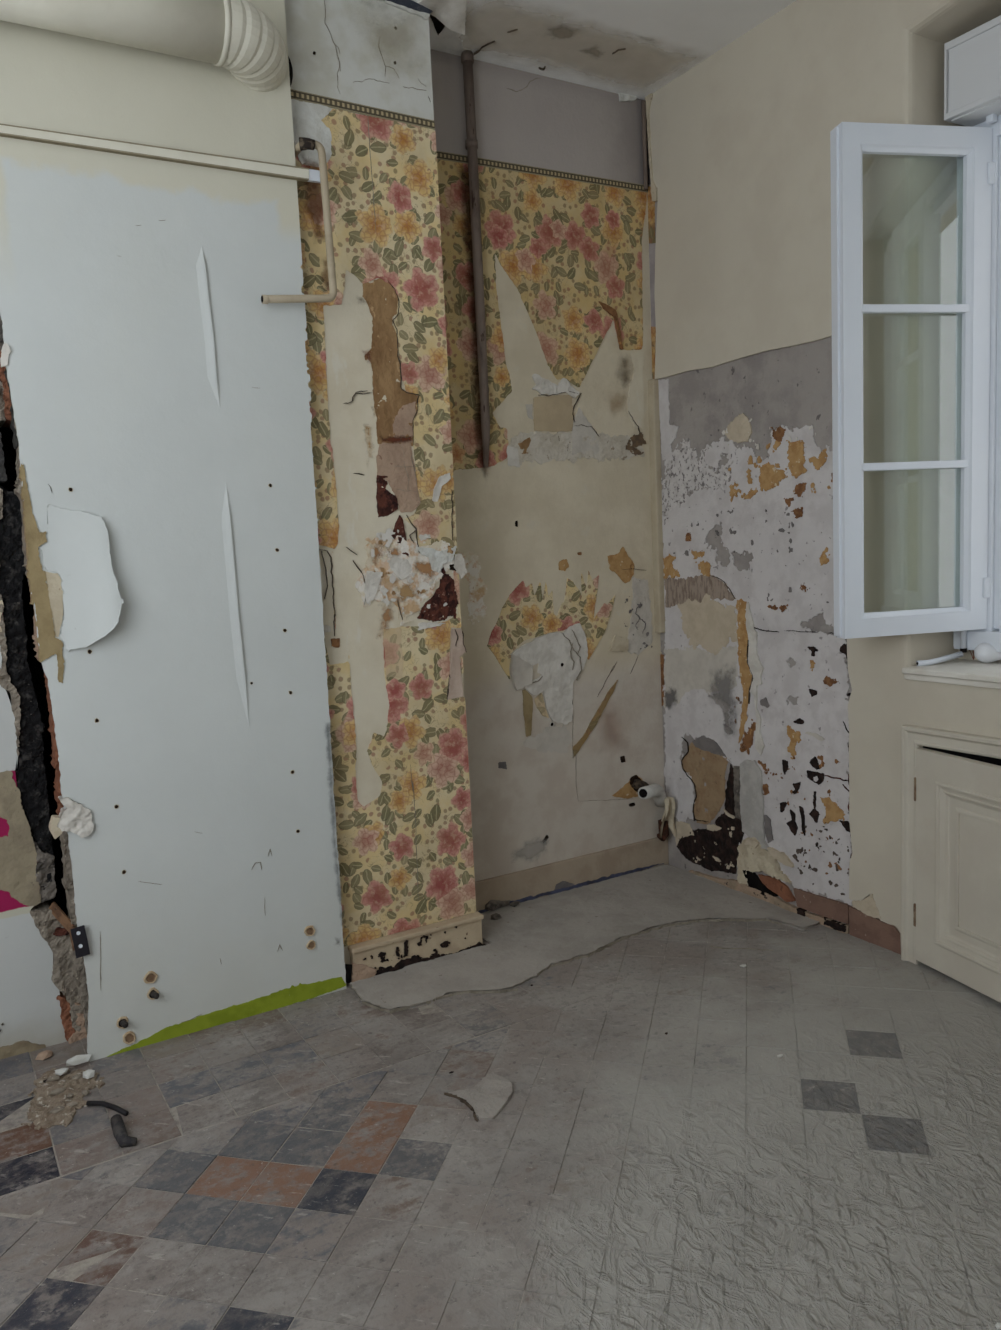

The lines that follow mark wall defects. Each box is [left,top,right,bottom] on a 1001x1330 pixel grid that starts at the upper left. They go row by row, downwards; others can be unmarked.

crack [324,0,431,102]
flaking render [291,99,332,167]
flaking render [362,278,467,630]
peeling [45,571,63,637]
flaking render [324,625,340,648]
peeling [509,374,881,934]
peeling [0,770,41,906]
peeling [396,939,422,959]